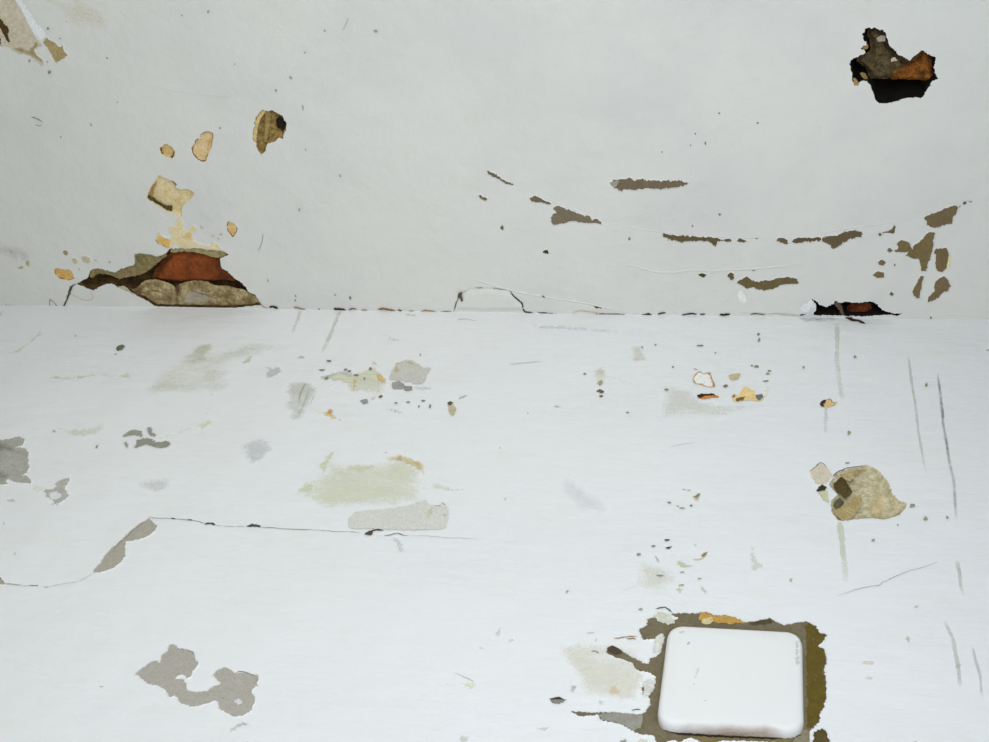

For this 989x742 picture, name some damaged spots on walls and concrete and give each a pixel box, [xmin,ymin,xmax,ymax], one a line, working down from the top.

spalling [0,0,69,75]
peeling [609,176,690,193]
flaking render [54,175,261,308]
peeling [661,225,758,247]
peeling [775,229,864,250]
peeling [871,201,972,303]
peeling [0,436,34,486]
crack [152,517,478,539]
peeling [348,500,449,550]
flaking render [808,462,915,526]
peeling [134,644,260,726]
flaking render [569,607,831,742]